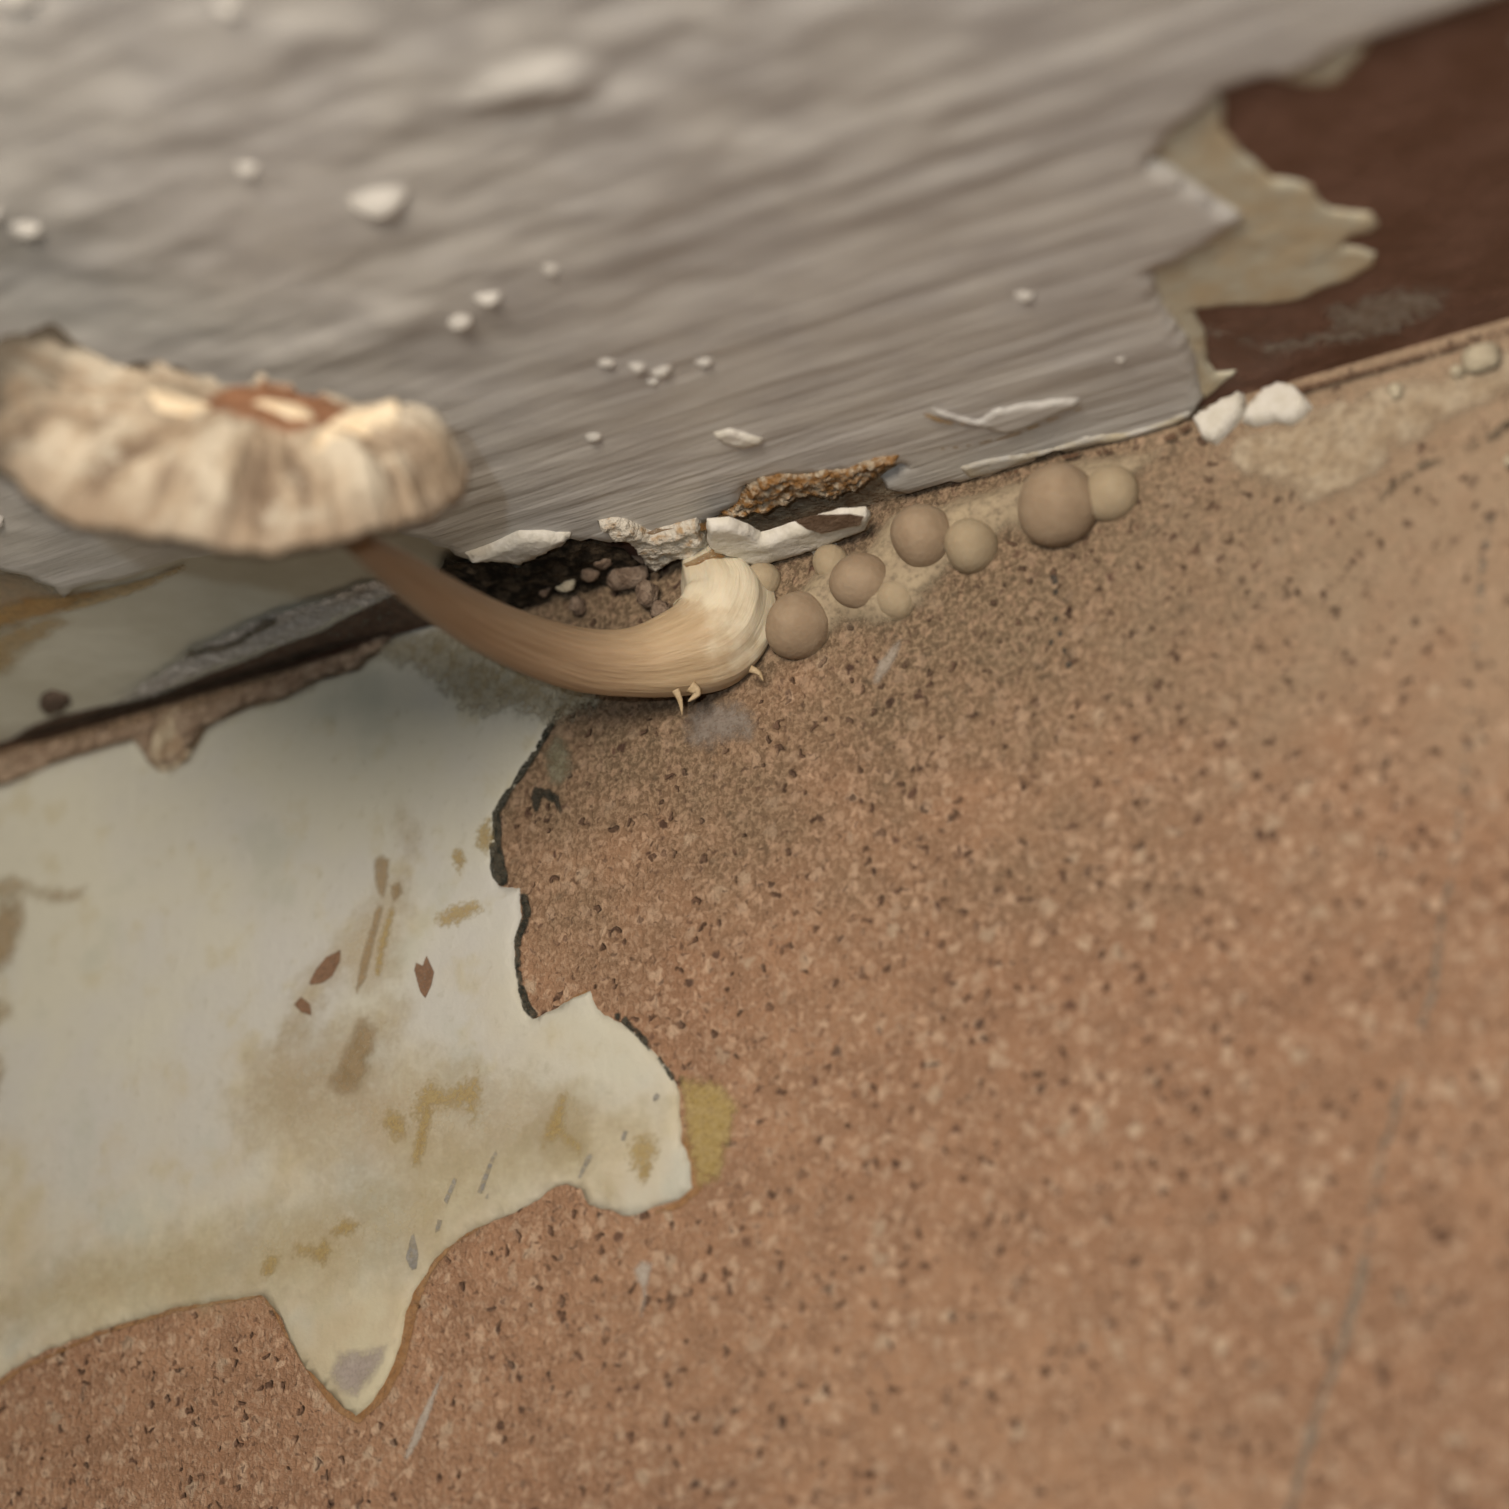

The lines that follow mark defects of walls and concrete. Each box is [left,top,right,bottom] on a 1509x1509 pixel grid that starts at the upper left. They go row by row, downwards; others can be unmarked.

peeling [924,0,1509,477]
spalling [371,506,871,609]
peeling [0,546,702,1423]